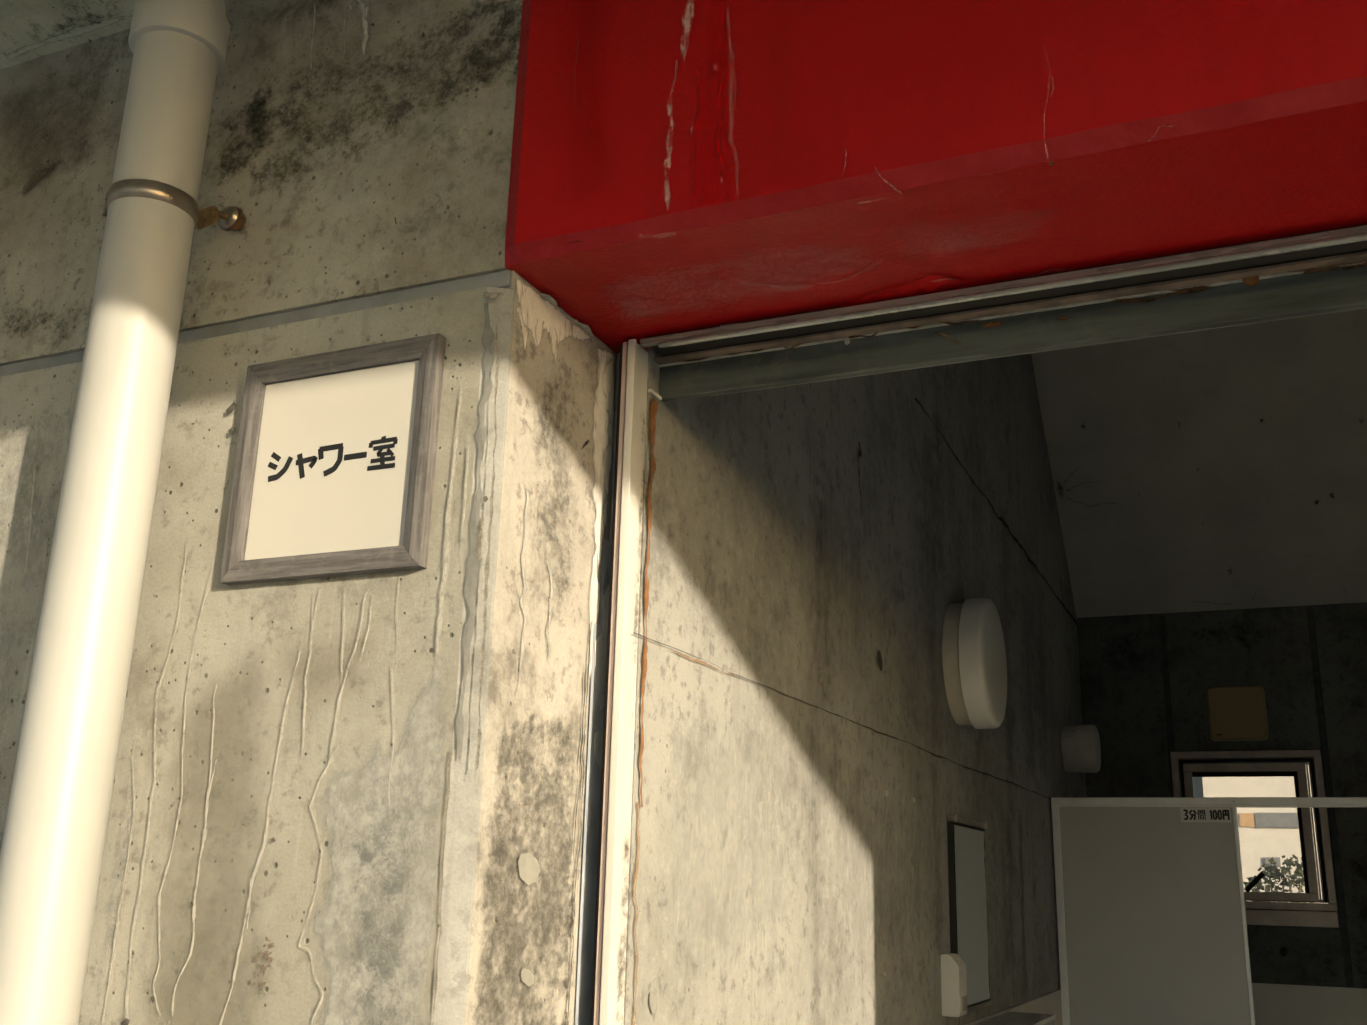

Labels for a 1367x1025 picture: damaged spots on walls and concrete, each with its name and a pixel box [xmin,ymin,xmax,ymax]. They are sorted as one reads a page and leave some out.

water stain [215,0,521,196]
crack [915,398,1077,625]
water stain [101,541,188,1025]
water stain [153,570,321,1025]
water stain [330,591,374,757]
water stain [479,715,576,1025]
rust [633,397,658,1025]